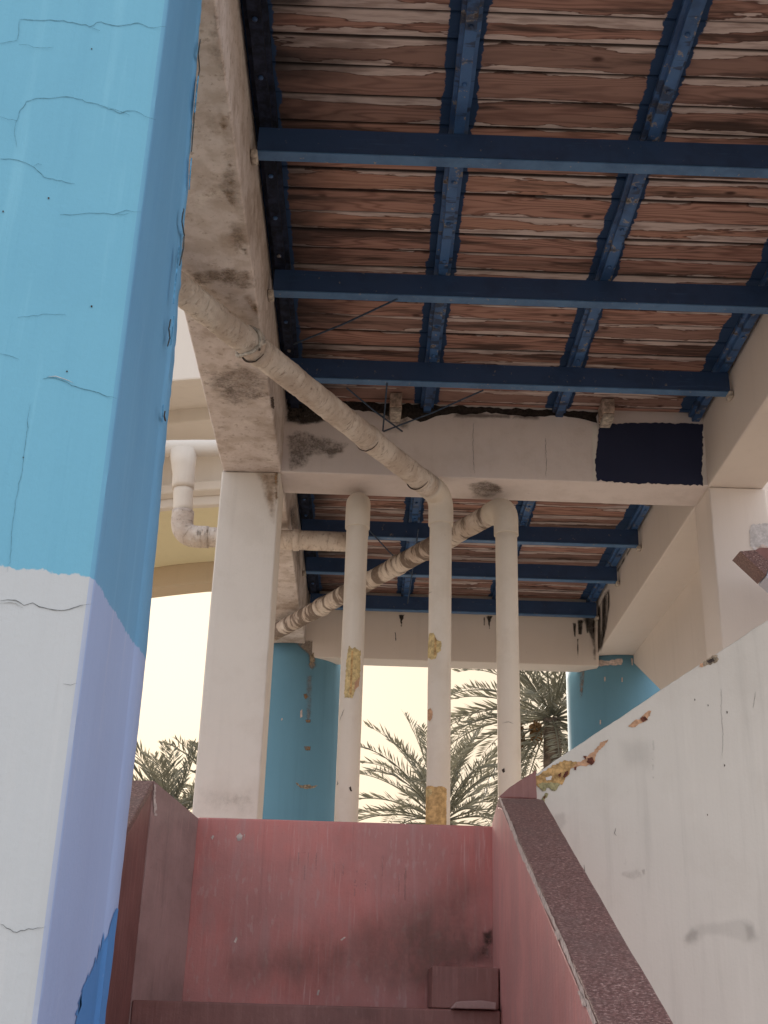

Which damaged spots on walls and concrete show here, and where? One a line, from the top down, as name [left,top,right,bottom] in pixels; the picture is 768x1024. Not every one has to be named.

crack [5,19,166,48]
crack [2,96,156,184]
crack [44,376,110,397]
damp [287,402,342,466]
crack [1,599,88,611]
peeling [428,633,442,660]
peeling [344,646,361,698]
peeling [628,710,652,727]
peeling [536,740,608,802]
peeling [425,786,447,825]